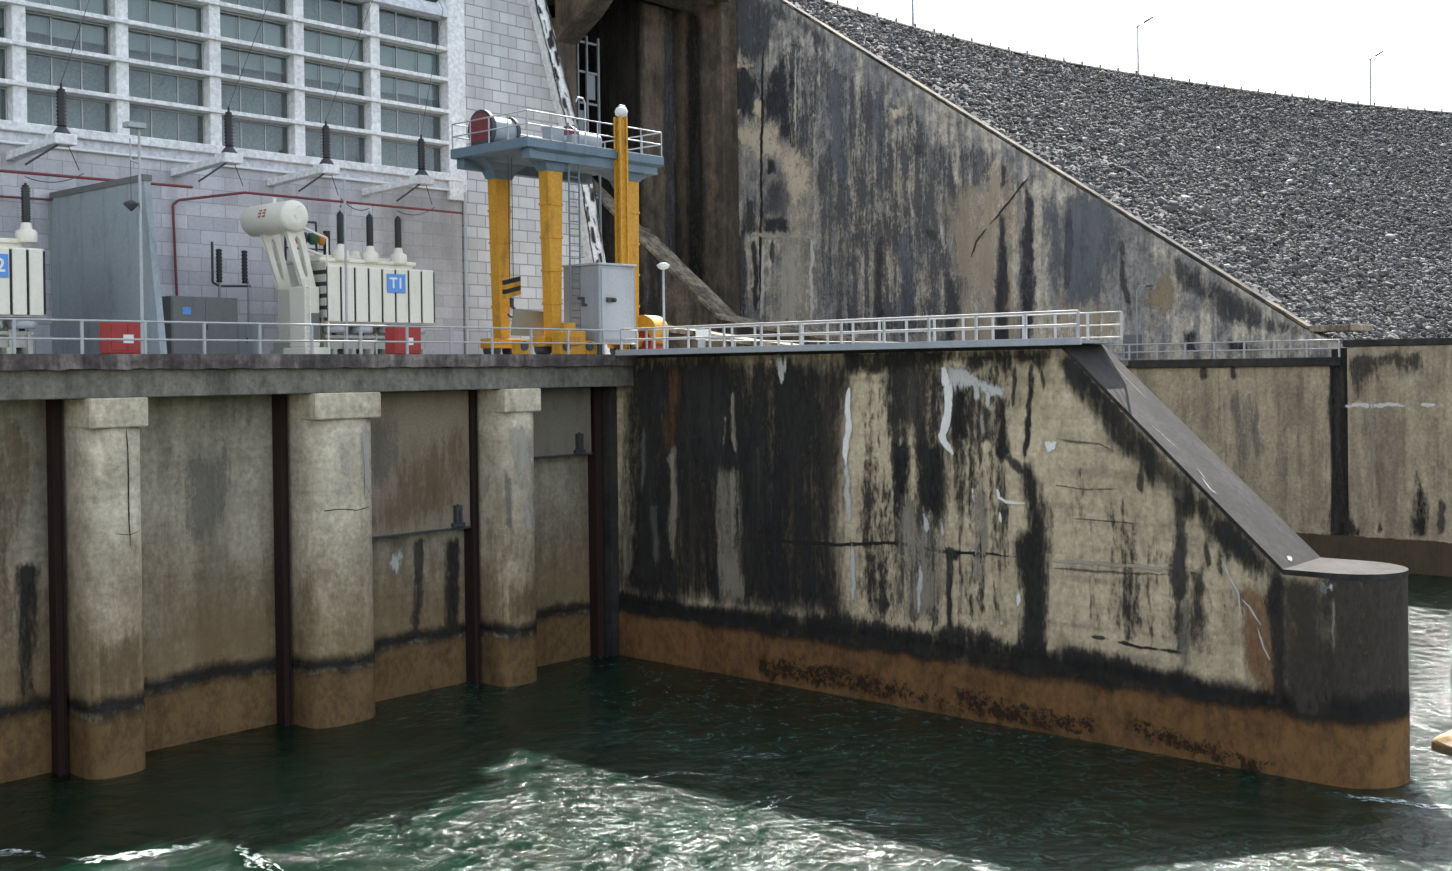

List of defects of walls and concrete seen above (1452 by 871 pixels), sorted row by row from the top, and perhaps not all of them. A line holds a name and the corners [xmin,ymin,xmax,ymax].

crack [971,178,1028,256]
leakage [0,538,590,783]
leakage [79,844,197,863]